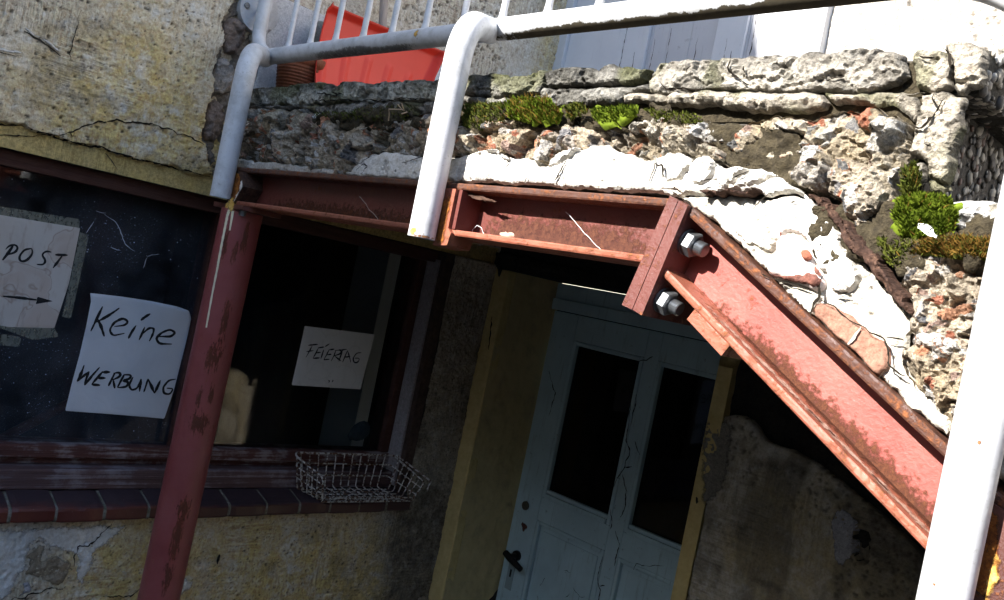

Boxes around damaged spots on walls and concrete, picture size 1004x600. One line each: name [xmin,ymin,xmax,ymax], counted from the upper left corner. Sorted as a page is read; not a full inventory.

crack [0,118,210,177]
rust [276,195,450,243]
rust [485,212,647,255]
crack [761,272,905,379]
rust [188,301,232,436]
crack [537,394,659,600]
peeling [696,422,731,505]
peeling [26,546,71,585]
rust [976,511,1000,597]